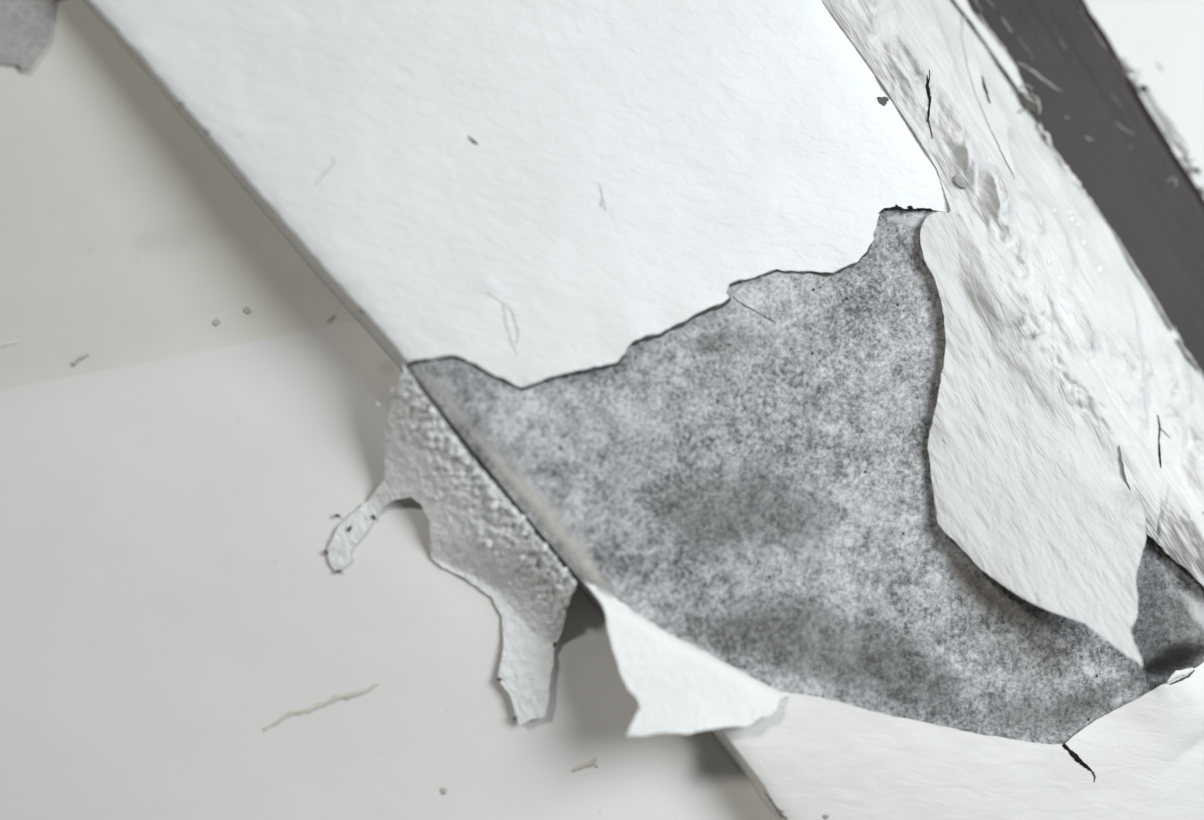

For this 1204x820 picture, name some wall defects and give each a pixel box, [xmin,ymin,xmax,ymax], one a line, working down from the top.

peeling [0,0,54,74]
spalling [324,204,1204,744]
crack [1062,743,1096,782]